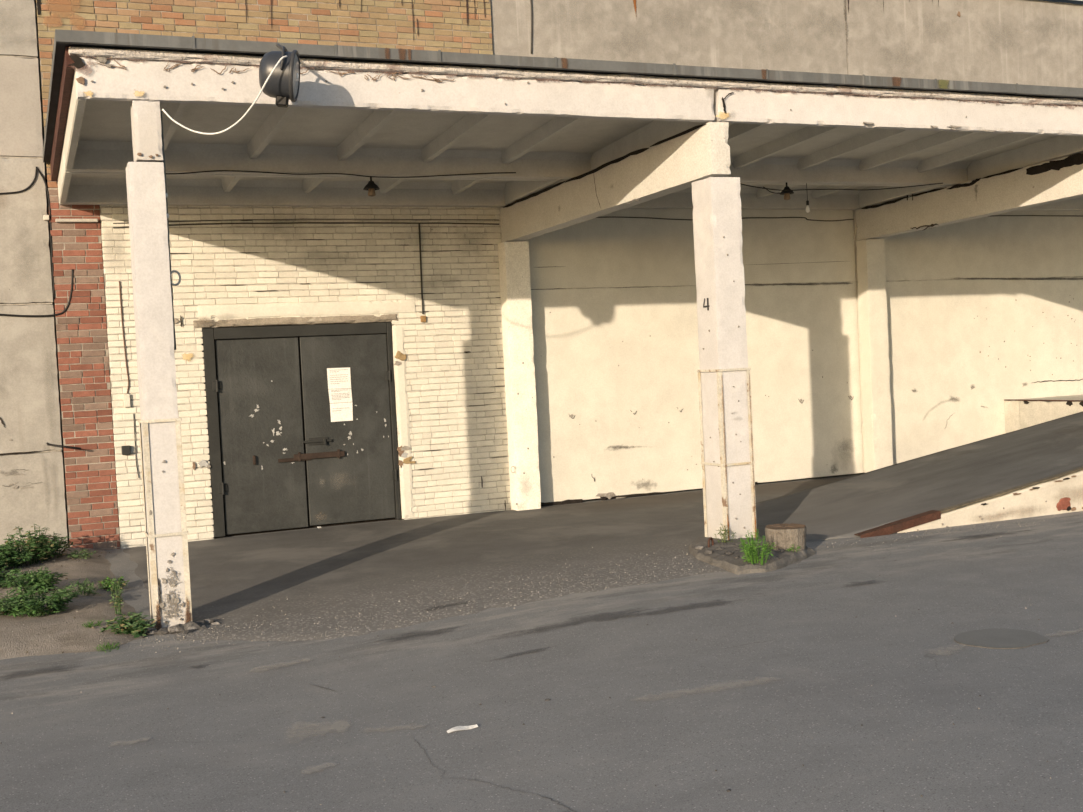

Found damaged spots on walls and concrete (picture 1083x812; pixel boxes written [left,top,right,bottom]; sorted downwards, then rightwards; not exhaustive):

spalling [68,55,114,85]
crack [503,92,734,208]
crack [861,168,1022,209]
spalling [1045,497,1083,511]
peeling [158,552,185,625]